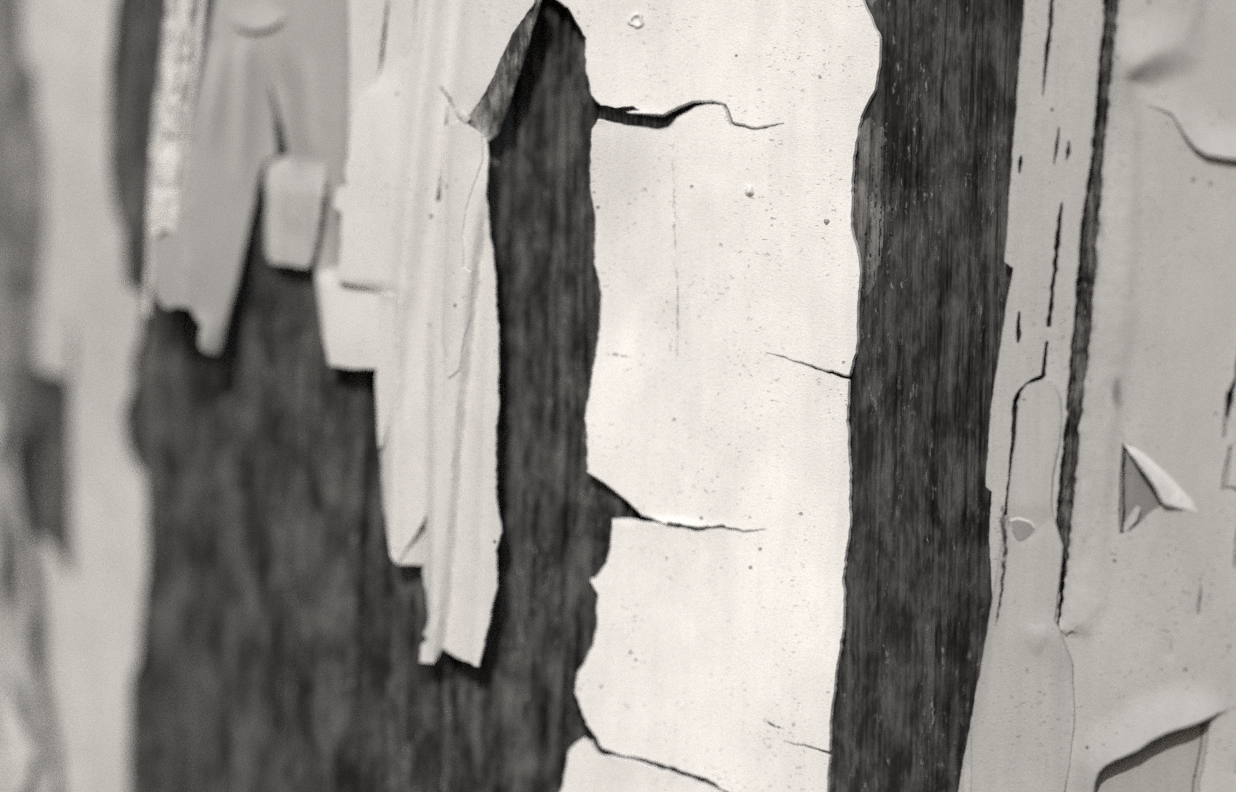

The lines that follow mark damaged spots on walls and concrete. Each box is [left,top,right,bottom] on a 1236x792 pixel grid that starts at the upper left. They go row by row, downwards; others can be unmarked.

crack [597,102,767,130]
spalling [110,0,636,792]
spalling [809,0,1236,792]
crack [1225,379,1236,416]
crack [643,517,741,531]
crack [574,699,727,792]